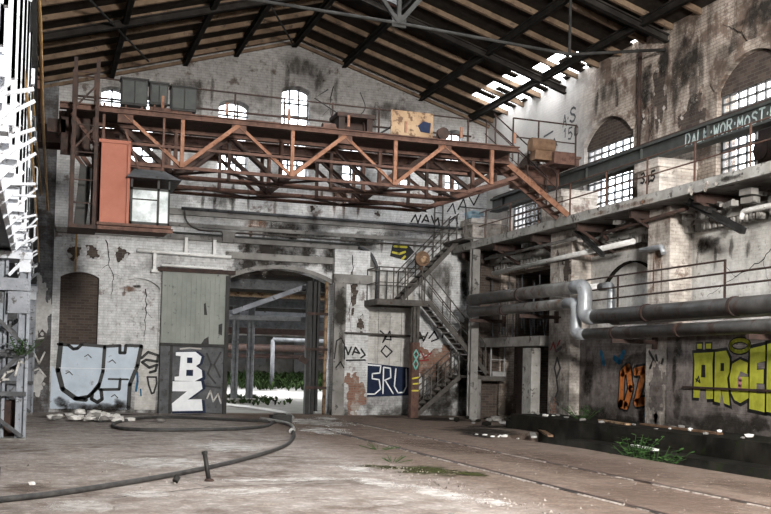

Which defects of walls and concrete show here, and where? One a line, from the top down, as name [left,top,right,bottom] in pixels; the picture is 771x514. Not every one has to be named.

water stain [595,80,618,112]
water stain [641,36,704,129]
peeling [67,244,101,261]
peeling [113,246,130,262]
spalling [341,372,546,463]
spalling [352,437,559,489]
spalling [652,483,729,500]